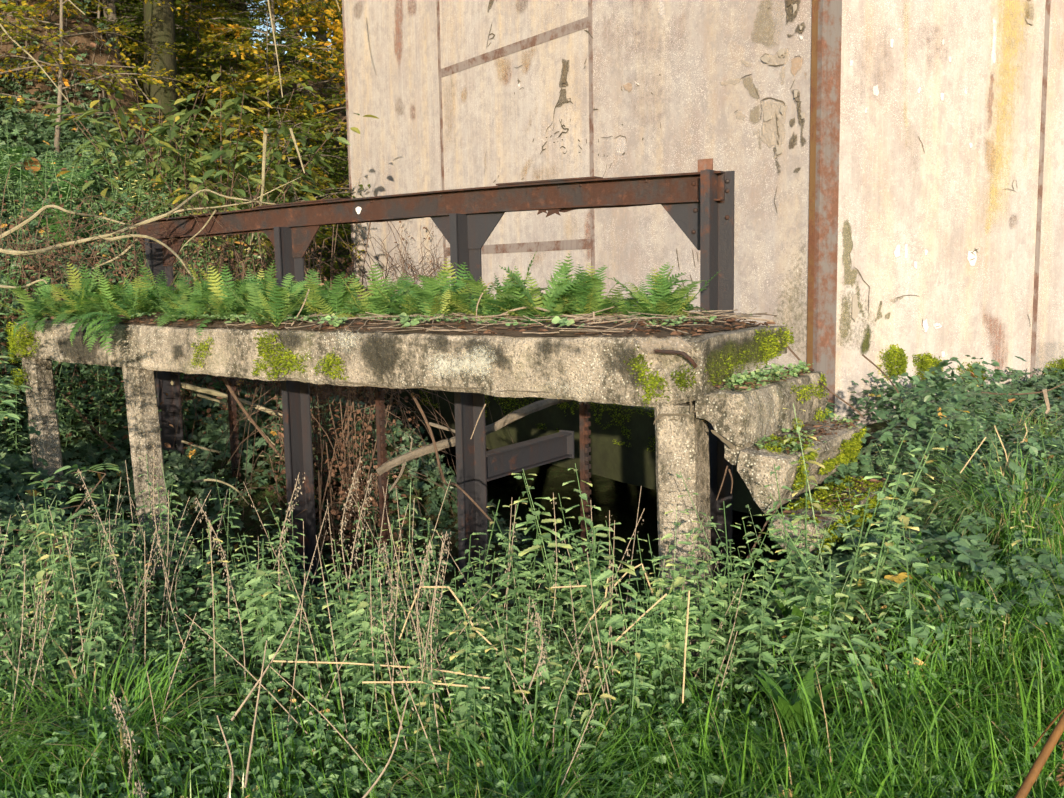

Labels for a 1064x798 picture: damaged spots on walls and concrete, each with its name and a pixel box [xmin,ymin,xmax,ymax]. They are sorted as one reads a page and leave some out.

rust [394,0,403,59]
flaking render [533,59,627,156]
flaking render [721,0,806,173]
damp [991,0,1028,207]
rust [537,208,563,217]